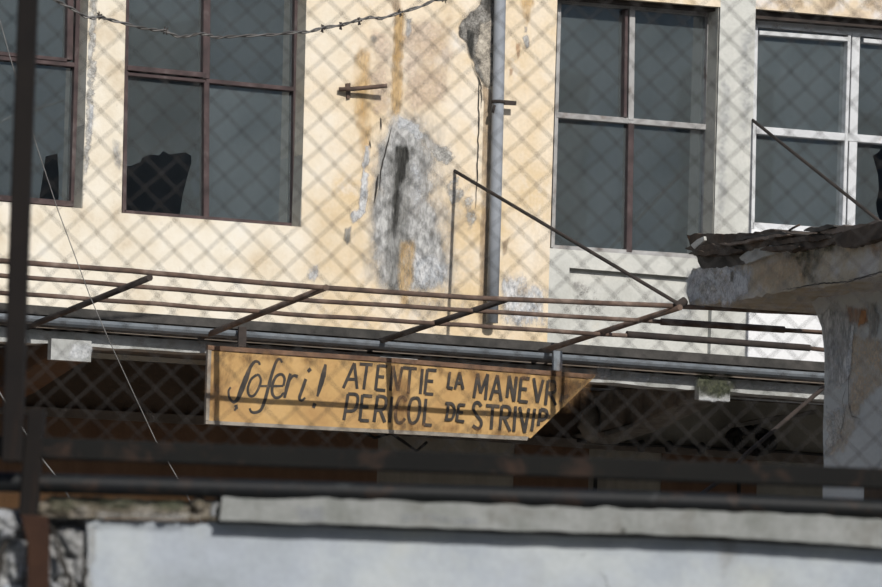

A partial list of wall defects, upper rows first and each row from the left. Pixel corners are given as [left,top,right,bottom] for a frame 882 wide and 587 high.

flaking render [459,0,494,86]
crack [370,118,391,202]
leakage [372,0,452,299]
peeling [421,133,452,165]
peeling [448,177,475,224]
peeling [412,252,446,288]
peeling [685,266,750,305]
peeling [821,308,882,409]
spalling [0,509,26,587]
spalling [49,522,88,587]